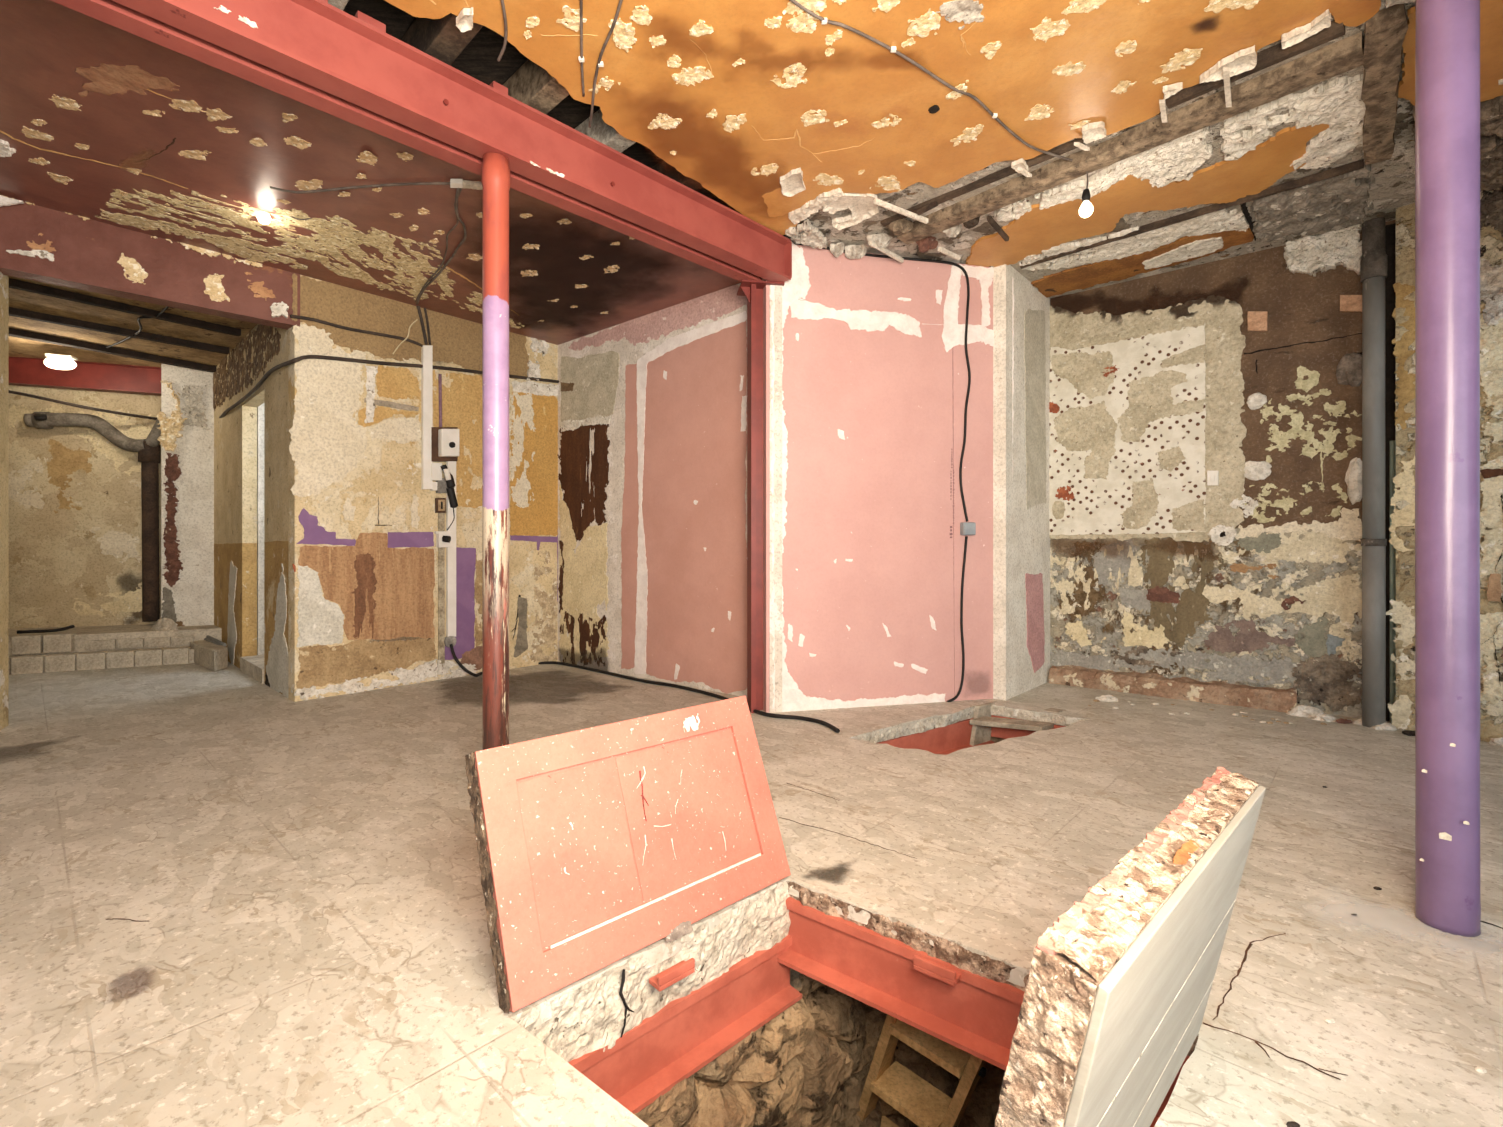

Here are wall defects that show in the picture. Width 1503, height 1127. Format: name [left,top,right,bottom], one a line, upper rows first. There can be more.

spalling [608,5,714,86]
spalling [901,0,984,48]
flaking render [994,74,1375,271]
flaking render [1480,79,1503,237]
peeling [65,168,482,521]
peeling [509,318,611,662]
spalling [1051,316,1207,480]
peeling [1260,366,1362,463]
flaking render [265,555,482,700]
flaking render [1050,446,1362,711]
crack [619,969,634,1038]
crack [1203,933,1348,1080]